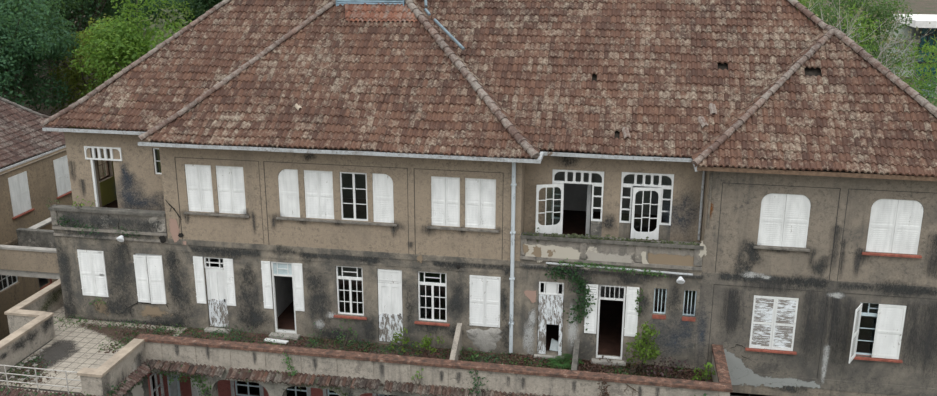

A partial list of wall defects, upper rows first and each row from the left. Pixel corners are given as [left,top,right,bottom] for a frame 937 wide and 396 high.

leakage [61,165,164,239]
leakage [0,319,52,359]
leakage [56,241,76,319]
leakage [99,244,190,327]
leakage [191,247,260,259]
leakage [237,269,267,327]
leakage [273,246,379,340]
flaking render [523,241,707,269]
flaking render [723,346,820,389]
leakage [719,226,937,379]